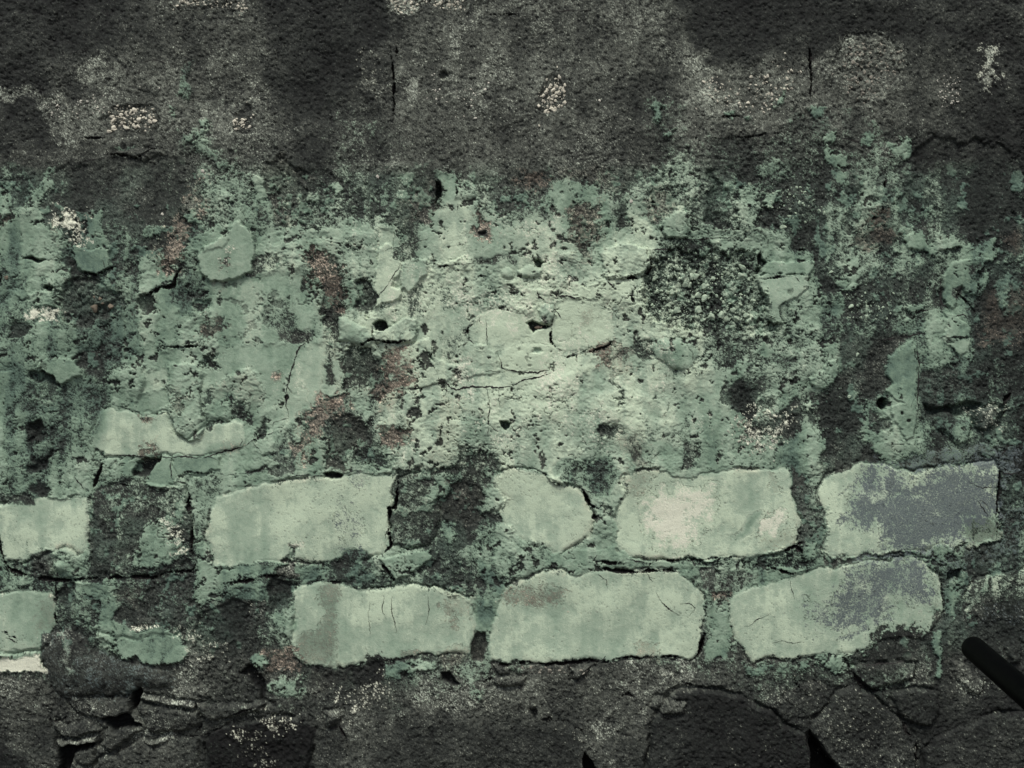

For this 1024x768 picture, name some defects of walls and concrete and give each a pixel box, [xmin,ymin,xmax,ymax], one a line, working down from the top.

leakage [255,0,416,120]
crack [390,47,398,114]
leakage [671,0,906,81]
crack [807,44,815,97]
leakage [977,45,1002,93]
spalling [600,210,815,340]
flaking render [894,132,1024,357]
peeling [164,351,270,443]
peeling [334,296,619,392]
crack [398,291,617,433]
crack [0,339,313,623]
leakage [229,716,296,768]